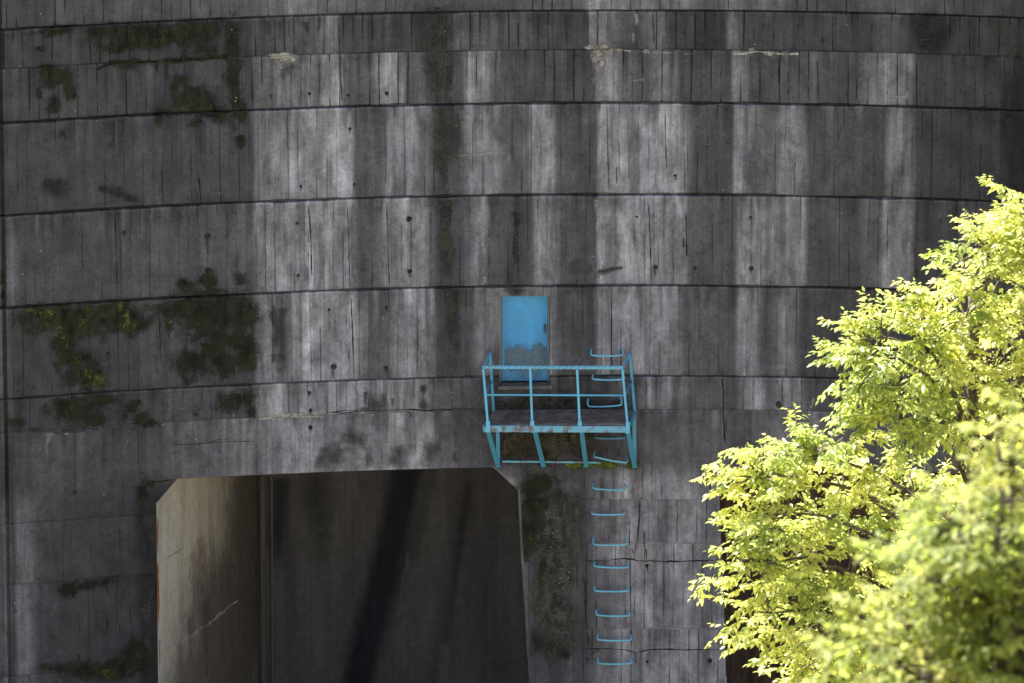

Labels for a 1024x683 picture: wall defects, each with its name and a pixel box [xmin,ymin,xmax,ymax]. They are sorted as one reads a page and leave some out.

leakage [420,7,462,354]
peeling [505,343,547,379]
crack [175,438,252,446]
leakage [530,475,585,665]
crack [575,506,717,663]